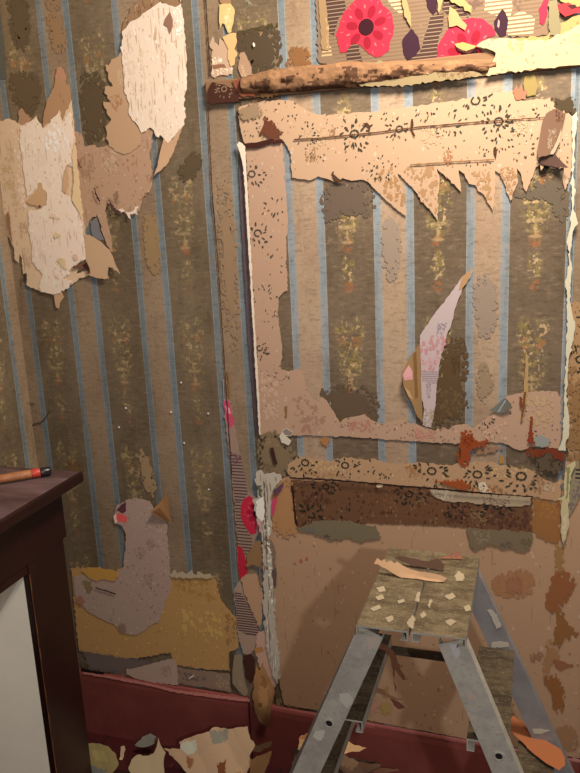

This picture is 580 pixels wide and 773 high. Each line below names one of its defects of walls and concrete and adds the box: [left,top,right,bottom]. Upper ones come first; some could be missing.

flaking render [120,2,187,143]
flaking render [19,112,86,294]
spalling [279,428,292,445]
rust [455,430,503,467]
rust [524,416,569,462]
damp [491,568,535,599]
flaking render [71,567,239,679]